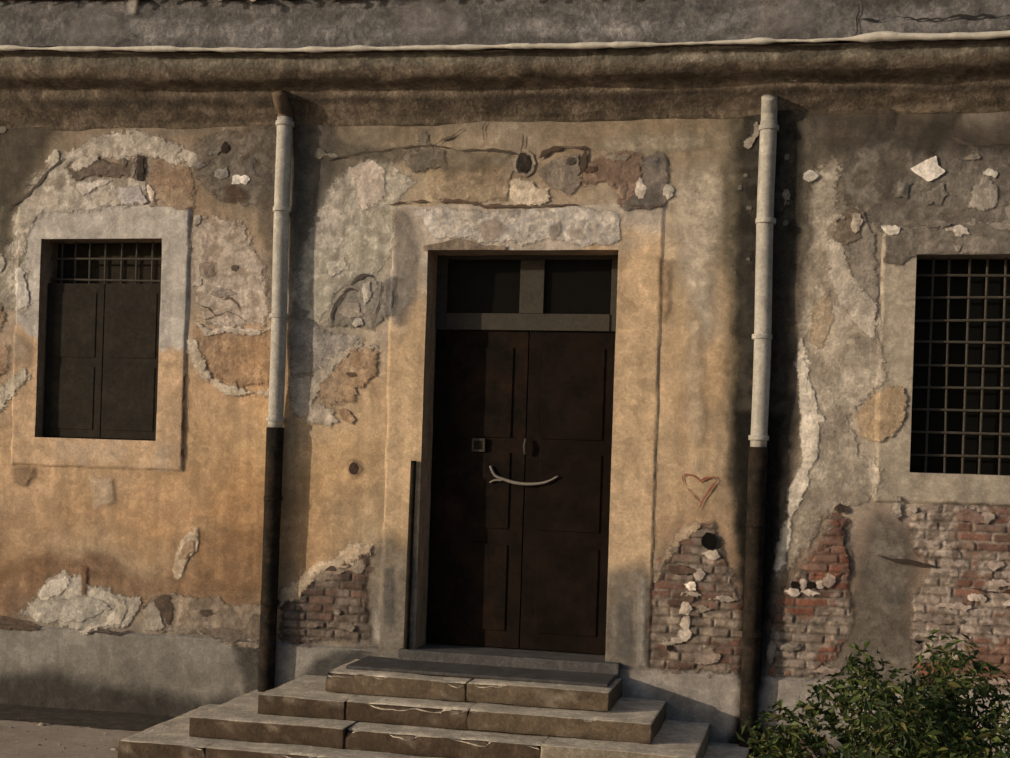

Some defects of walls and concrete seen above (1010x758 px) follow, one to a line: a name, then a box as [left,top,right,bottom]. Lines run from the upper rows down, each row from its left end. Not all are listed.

peeling [0,126,277,397]
peeling [287,129,509,427]
crack [313,121,524,161]
peeling [412,133,726,445]
water stain [723,115,761,631]
water stain [758,109,1010,698]
peeling [766,112,1010,689]
crack [855,0,1010,36]
water stain [0,675,224,717]
peeling [20,566,261,649]
water stain [233,640,259,694]
flaking render [645,521,743,677]